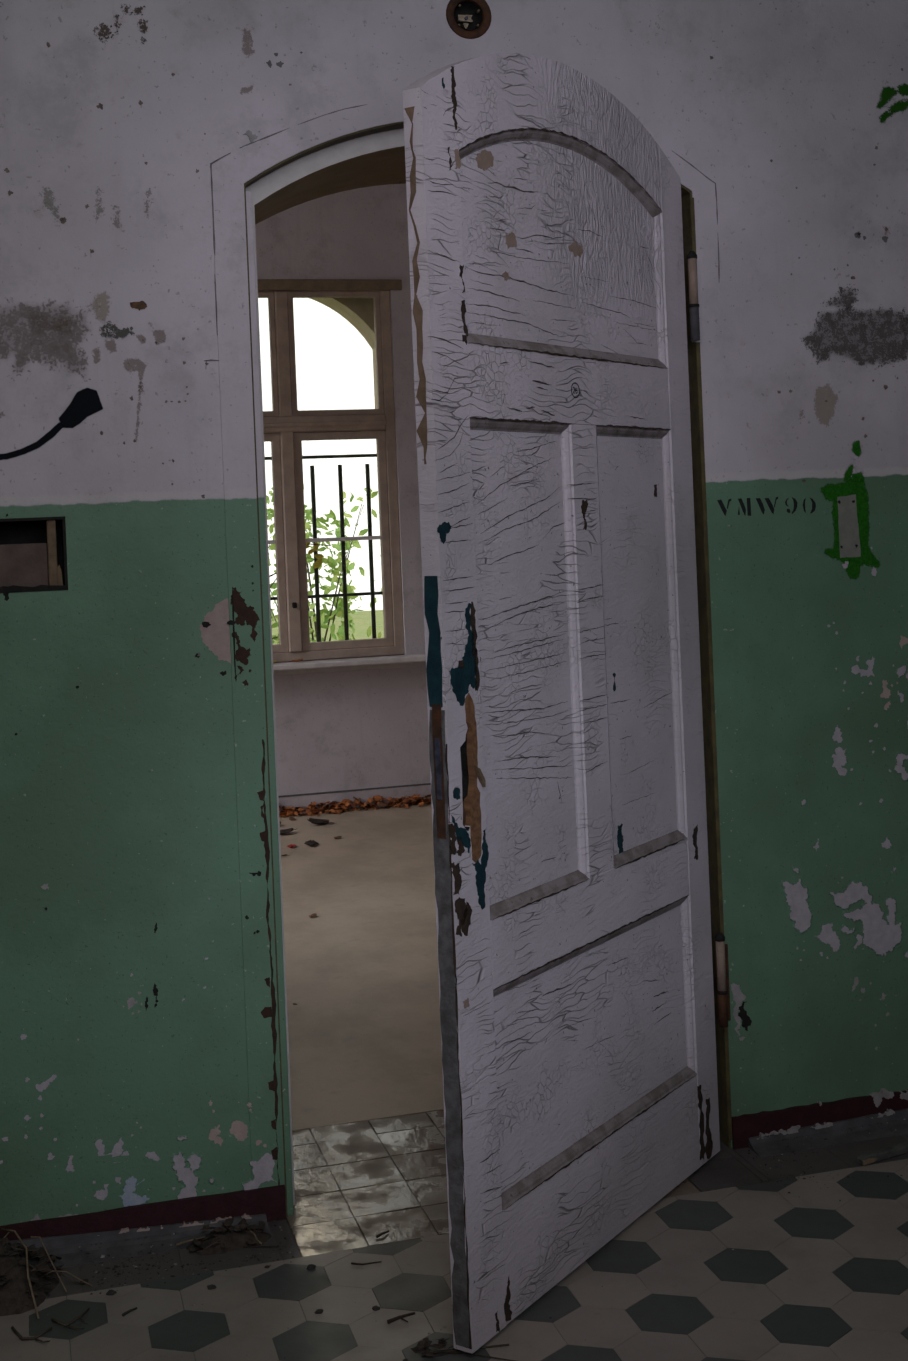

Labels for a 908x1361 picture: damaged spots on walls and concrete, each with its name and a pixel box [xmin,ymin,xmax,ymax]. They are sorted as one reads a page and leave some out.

damp [0,299,135,380]
crack [424,157,672,805]
peeling [832,656,908,782]
peeling [780,866,908,961]
crack [464,984,571,1047]
crack [612,958,670,1025]
peeling [93,1122,150,1207]
peeling [145,1134,224,1199]
peeling [209,1100,275,1190]
peeling [757,1122,833,1140]
peeling [869,1088,908,1119]